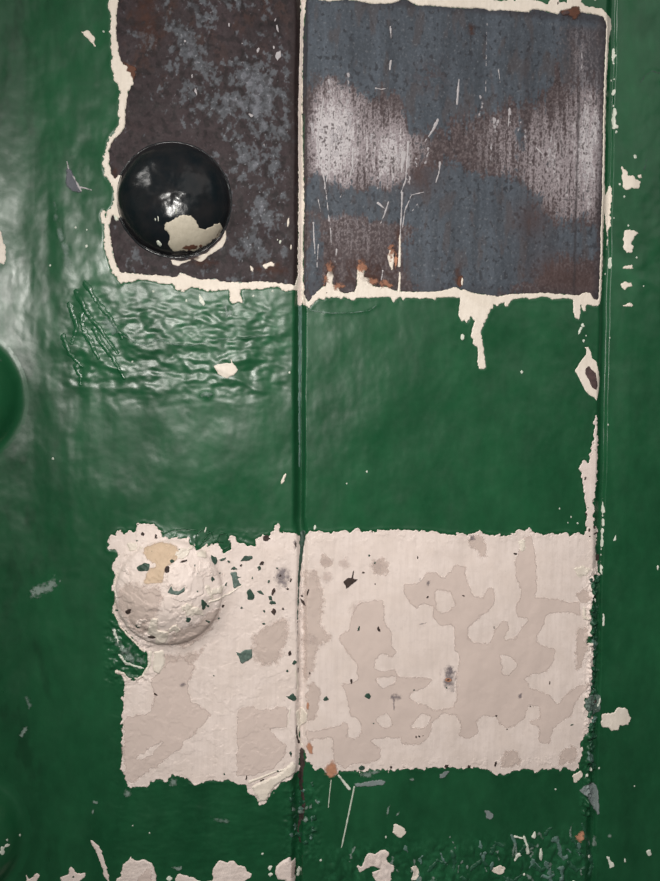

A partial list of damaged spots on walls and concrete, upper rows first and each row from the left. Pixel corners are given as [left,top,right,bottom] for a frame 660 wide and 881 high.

peeling [82,0,642,467]
peeling [107,415,631,845]
peeling [60,867,85,881]
peeling [91,840,198,881]
peeling [212,860,252,881]
peeling [268,857,301,881]
peeling [349,847,398,881]
peeling [385,823,596,881]